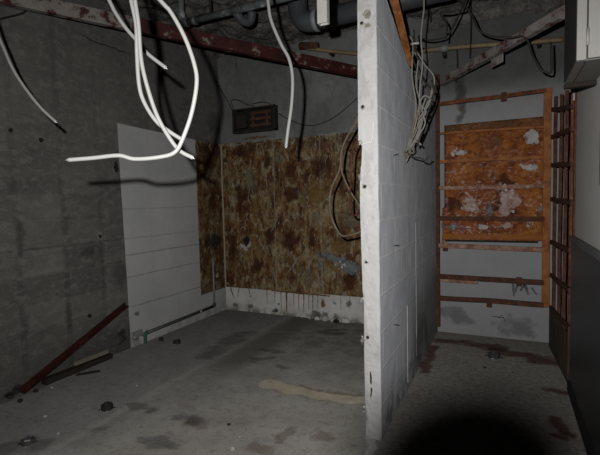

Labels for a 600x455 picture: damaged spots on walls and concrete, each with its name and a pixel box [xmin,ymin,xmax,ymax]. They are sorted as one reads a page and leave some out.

rust [487,175,518,216]